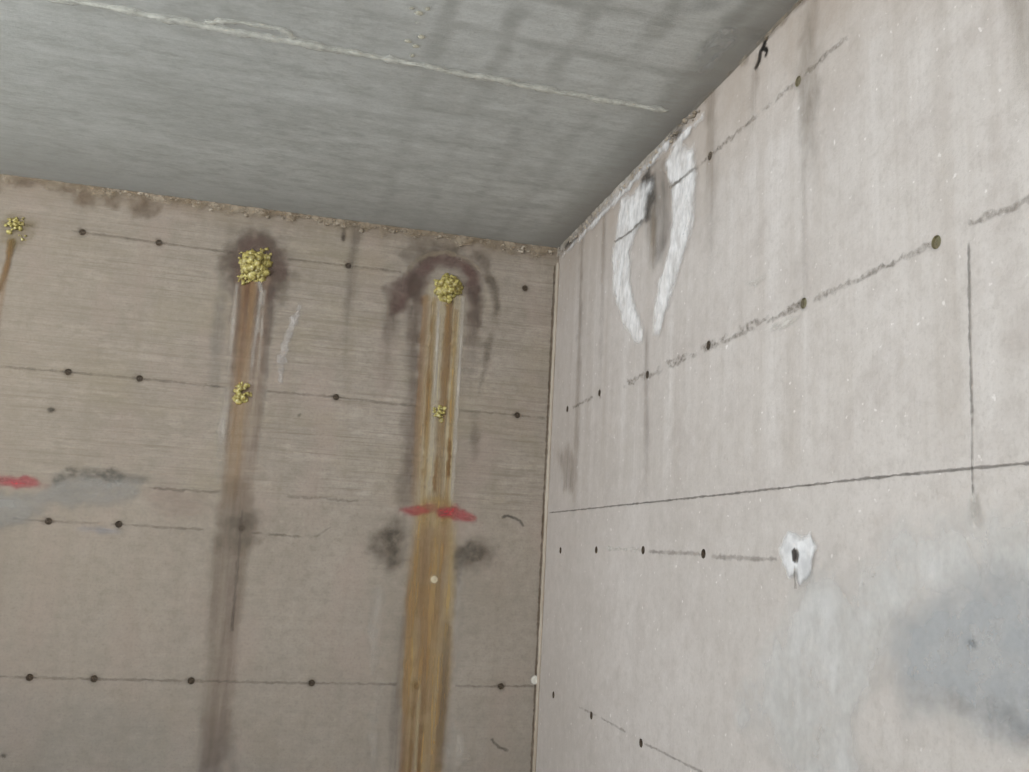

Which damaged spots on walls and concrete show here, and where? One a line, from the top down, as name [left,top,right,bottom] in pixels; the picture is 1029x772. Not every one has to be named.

rust [0,239,15,289]
damp [392,251,496,314]
damp [612,150,695,341]
rust [404,297,462,772]